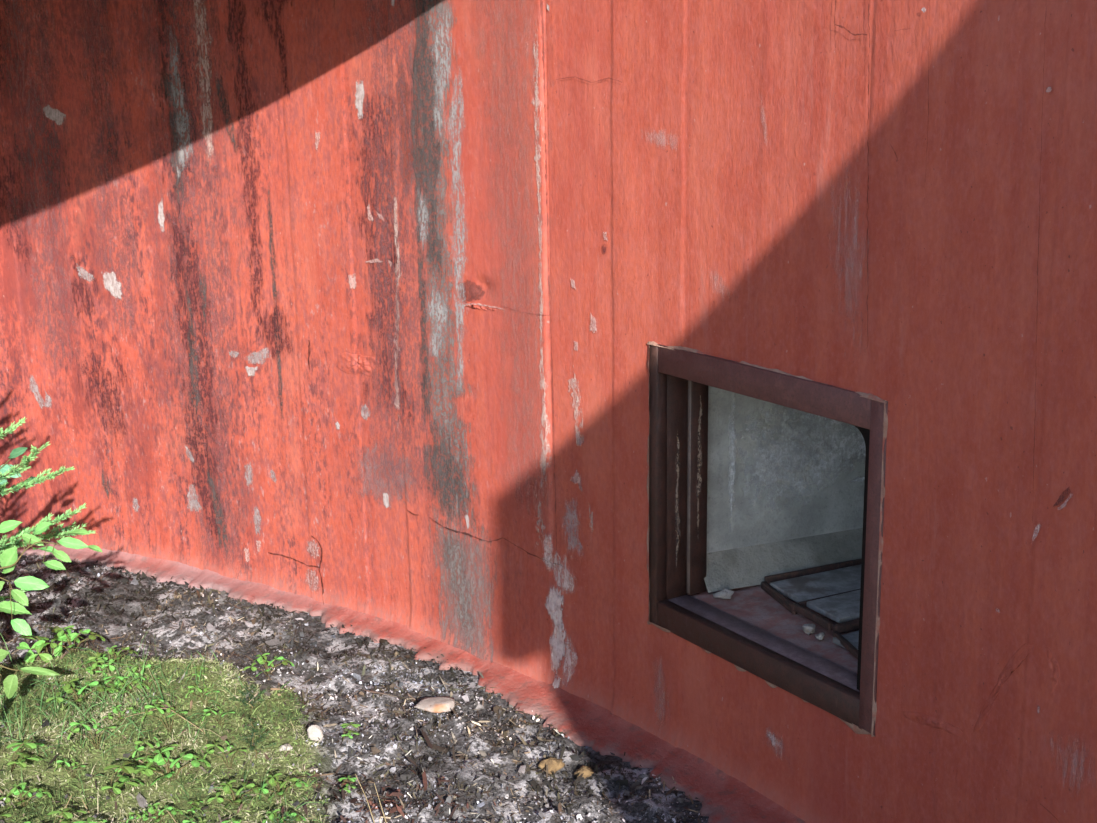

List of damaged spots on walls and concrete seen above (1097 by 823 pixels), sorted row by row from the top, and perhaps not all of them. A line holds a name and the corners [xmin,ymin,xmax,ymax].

water stain [139,0,292,564]
water stain [353,0,497,661]
crack [408,510,559,565]
water stain [533,34,551,487]
water stain [536,470,593,688]
water stain [568,366,584,445]
crack [834,0,870,346]